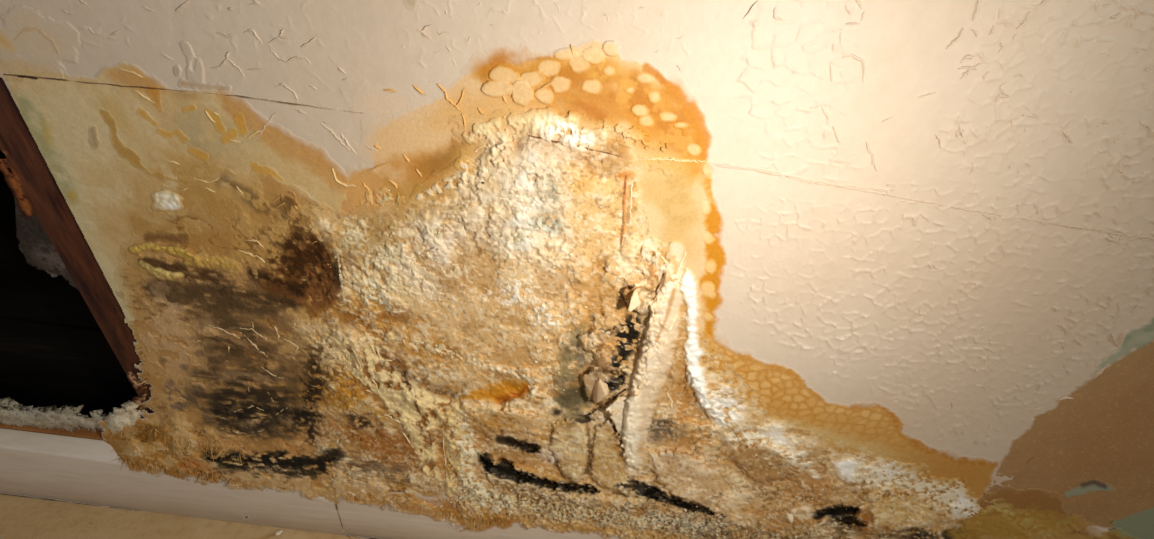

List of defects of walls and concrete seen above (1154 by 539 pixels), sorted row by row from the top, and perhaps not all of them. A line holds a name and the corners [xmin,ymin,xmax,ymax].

crack [3,74,366,114]
peeling [172,0,377,156]
leakage [0,4,825,484]
flaking render [80,108,982,539]
crack [528,135,1154,245]
peeling [722,0,1154,455]
leakage [389,336,736,539]
leakage [700,327,1141,539]